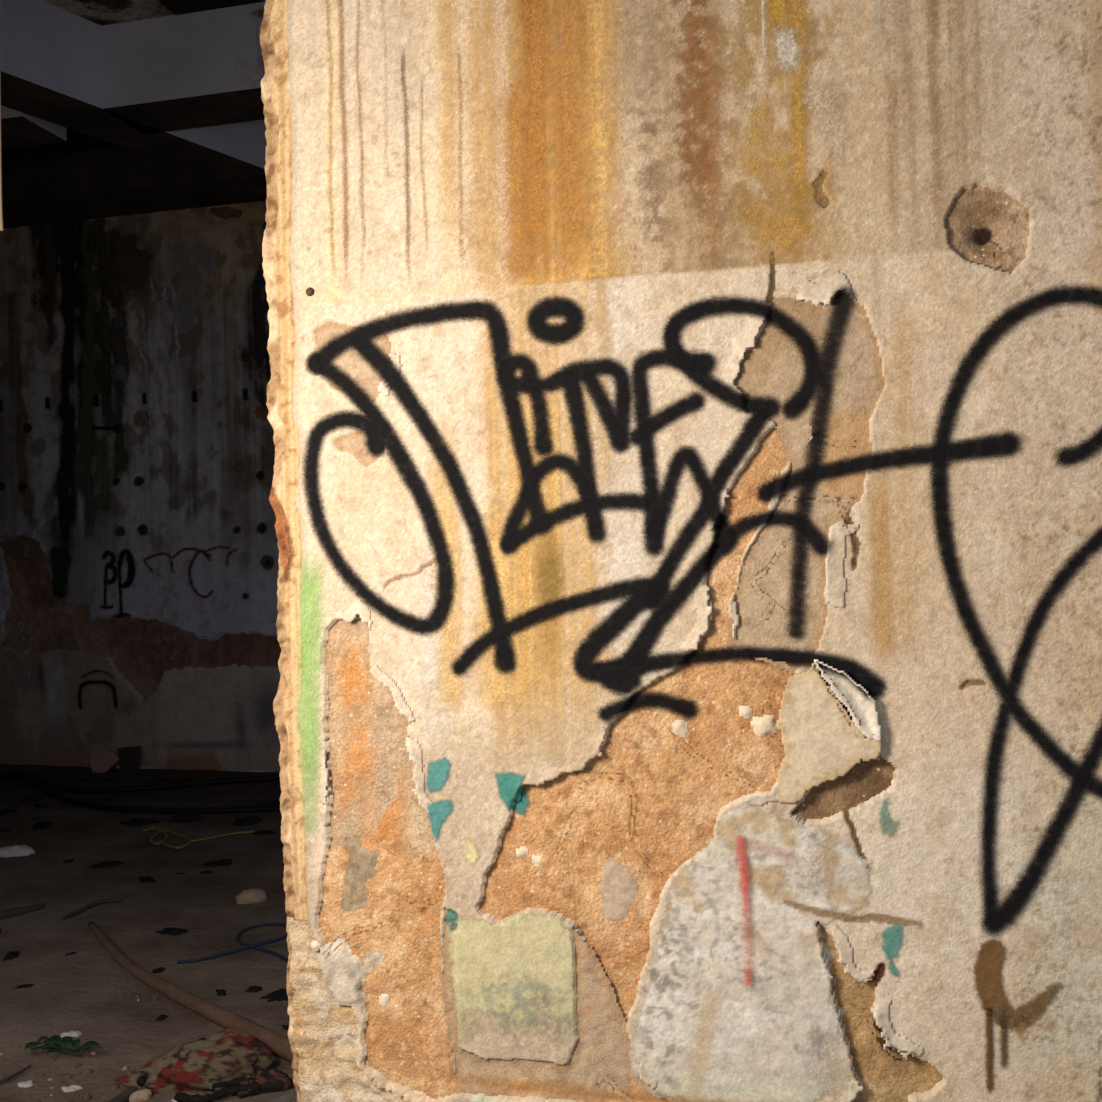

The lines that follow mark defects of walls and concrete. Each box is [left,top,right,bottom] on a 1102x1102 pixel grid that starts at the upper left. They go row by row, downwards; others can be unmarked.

water stain [8,293,34,524]
water stain [31,218,181,598]
water stain [241,261,271,410]
corrosion [504,0,628,285]
spalling [945,186,1029,274]
flaking render [0,529,281,700]
spalling [287,271,943,1102]